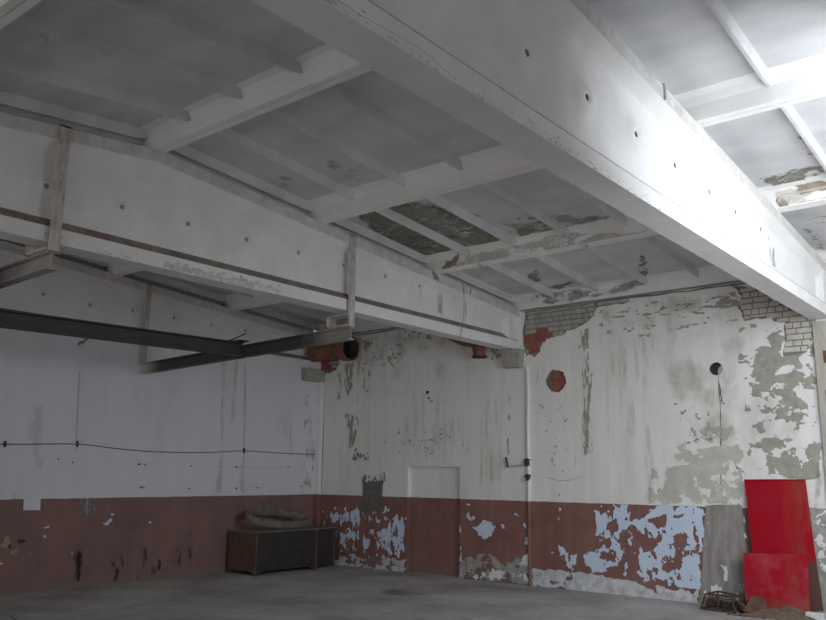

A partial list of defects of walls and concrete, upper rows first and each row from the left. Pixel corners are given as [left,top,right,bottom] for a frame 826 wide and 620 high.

peeling [776,181,826,207]
peeling [459,285,823,606]
peeling [322,505,407,572]
flaking render [809,507,826,617]